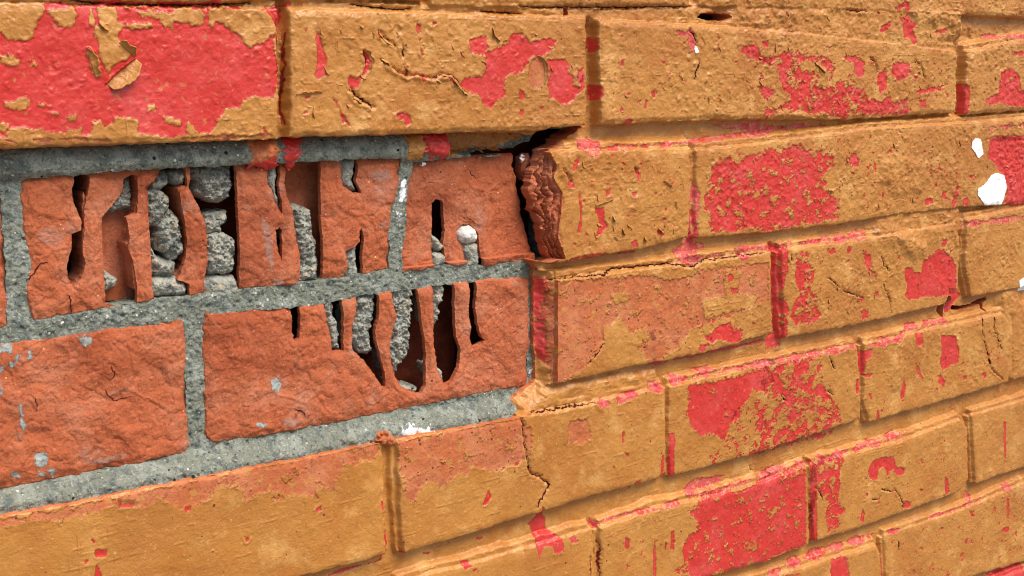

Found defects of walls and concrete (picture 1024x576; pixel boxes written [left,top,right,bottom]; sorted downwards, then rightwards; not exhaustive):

crack [350,4,468,95]
peeling [573,40,1024,181]
spalling [0,0,876,528]
crack [548,252,765,280]
peeling [647,238,961,468]
peeling [933,331,990,391]
crack [980,315,1003,380]
peeling [85,539,107,576]
crack [521,402,593,508]
peeling [587,430,902,576]
peeling [858,453,911,508]
peeling [909,482,1024,576]